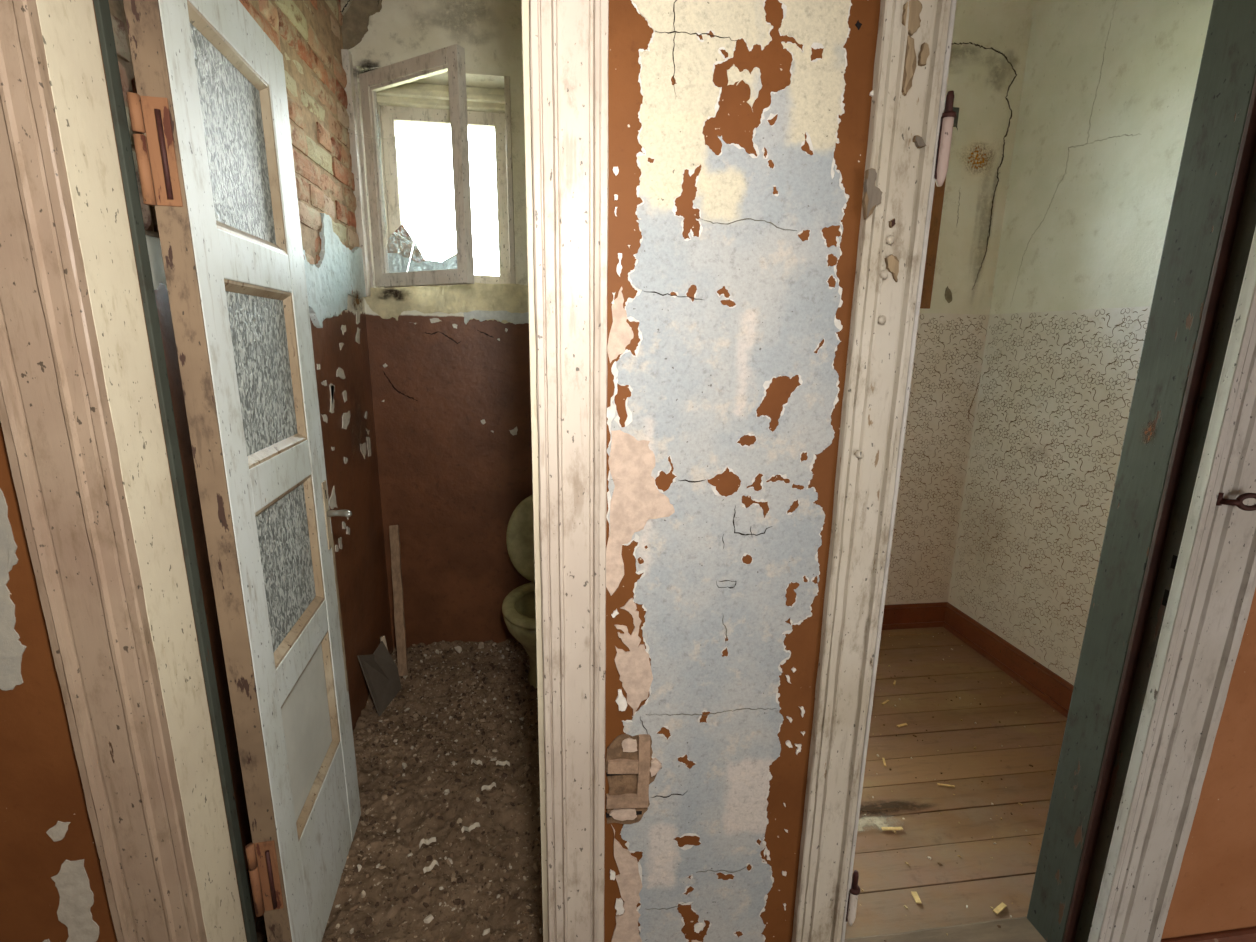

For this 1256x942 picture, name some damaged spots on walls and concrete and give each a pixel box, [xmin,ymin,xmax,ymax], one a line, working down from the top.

flaking render [108,0,159,238]
flaking render [239,0,529,350]
crack [655,0,737,94]
crack [1012,0,1138,299]
peeling [0,489,26,691]
peeling [329,486,350,552]
peeling [317,364,371,464]
peeling [605,0,883,942]
peeling [46,821,70,842]
peeling [51,859,99,942]